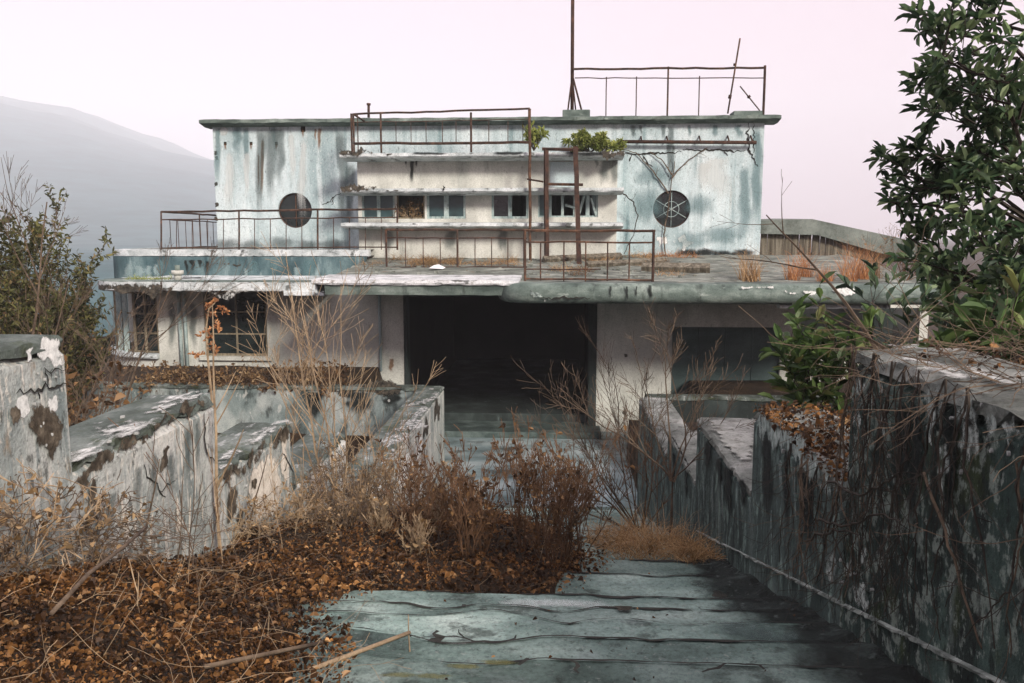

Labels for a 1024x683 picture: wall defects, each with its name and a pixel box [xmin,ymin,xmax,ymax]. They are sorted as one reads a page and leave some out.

peeling [26,337,65,381]
crack [16,367,67,399]
damp [762,436,813,530]
crack [411,604,474,642]